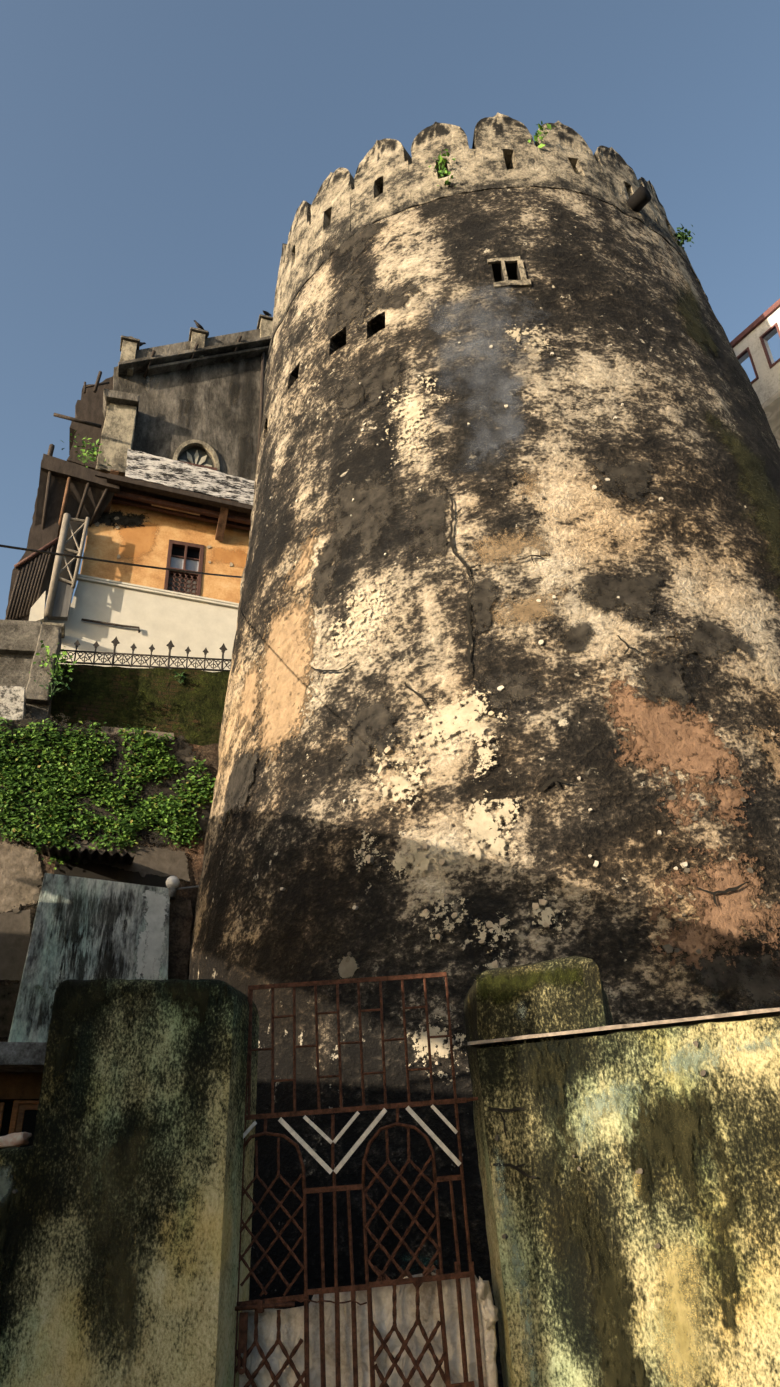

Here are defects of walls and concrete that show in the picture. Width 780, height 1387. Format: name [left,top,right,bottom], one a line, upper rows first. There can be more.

leakage [320,342,461,463]
leakage [489,323,561,360]
flaking render [234,527,324,768]
leakage [312,498,402,674]
leakage [579,584,662,627]
leakage [690,636,754,660]
leakage [336,679,568,981]
flaking render [600,676,780,977]
leakage [49,890,132,985]
leakage [720,964,780,1010]
leakage [524,1038,659,1387]
leakage [607,1071,748,1358]